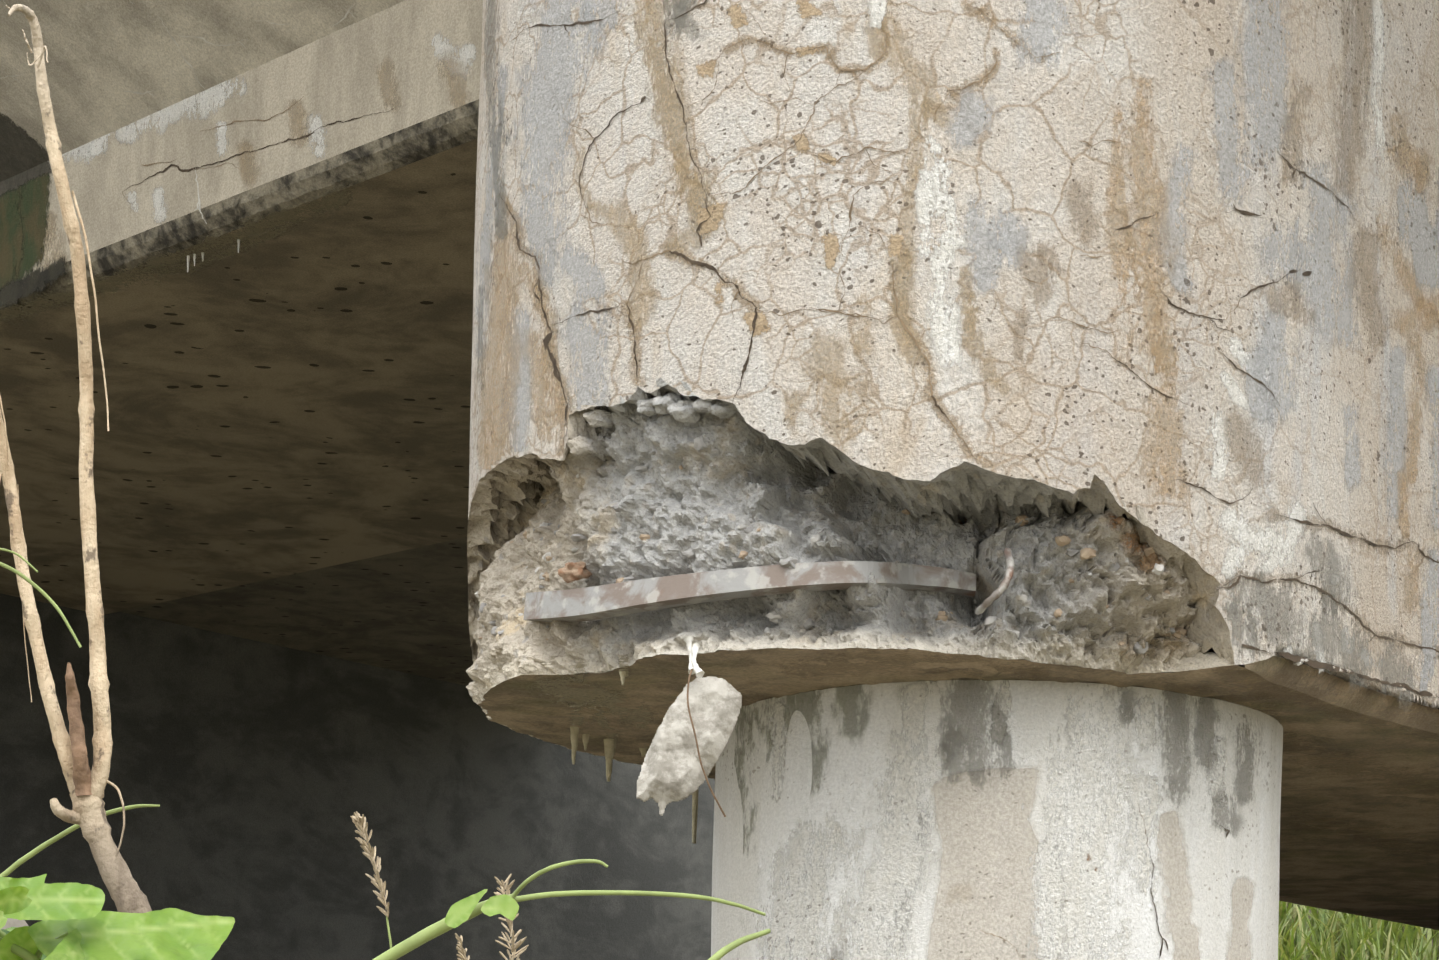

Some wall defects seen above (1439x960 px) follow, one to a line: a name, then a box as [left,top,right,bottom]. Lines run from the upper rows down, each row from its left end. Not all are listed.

water stain [0,79,352,320]
crack [122,96,394,224]
crack [501,0,982,462]
water stain [914,96,1024,367]
crack [1155,269,1312,406]
water stain [1208,313,1296,480]
corrosion [558,561,592,583]
spalling [466,378,1439,756]
water stain [1219,502,1306,578]
crack [1177,479,1439,577]
crack [1218,570,1439,652]
water stain [1032,691,1161,960]